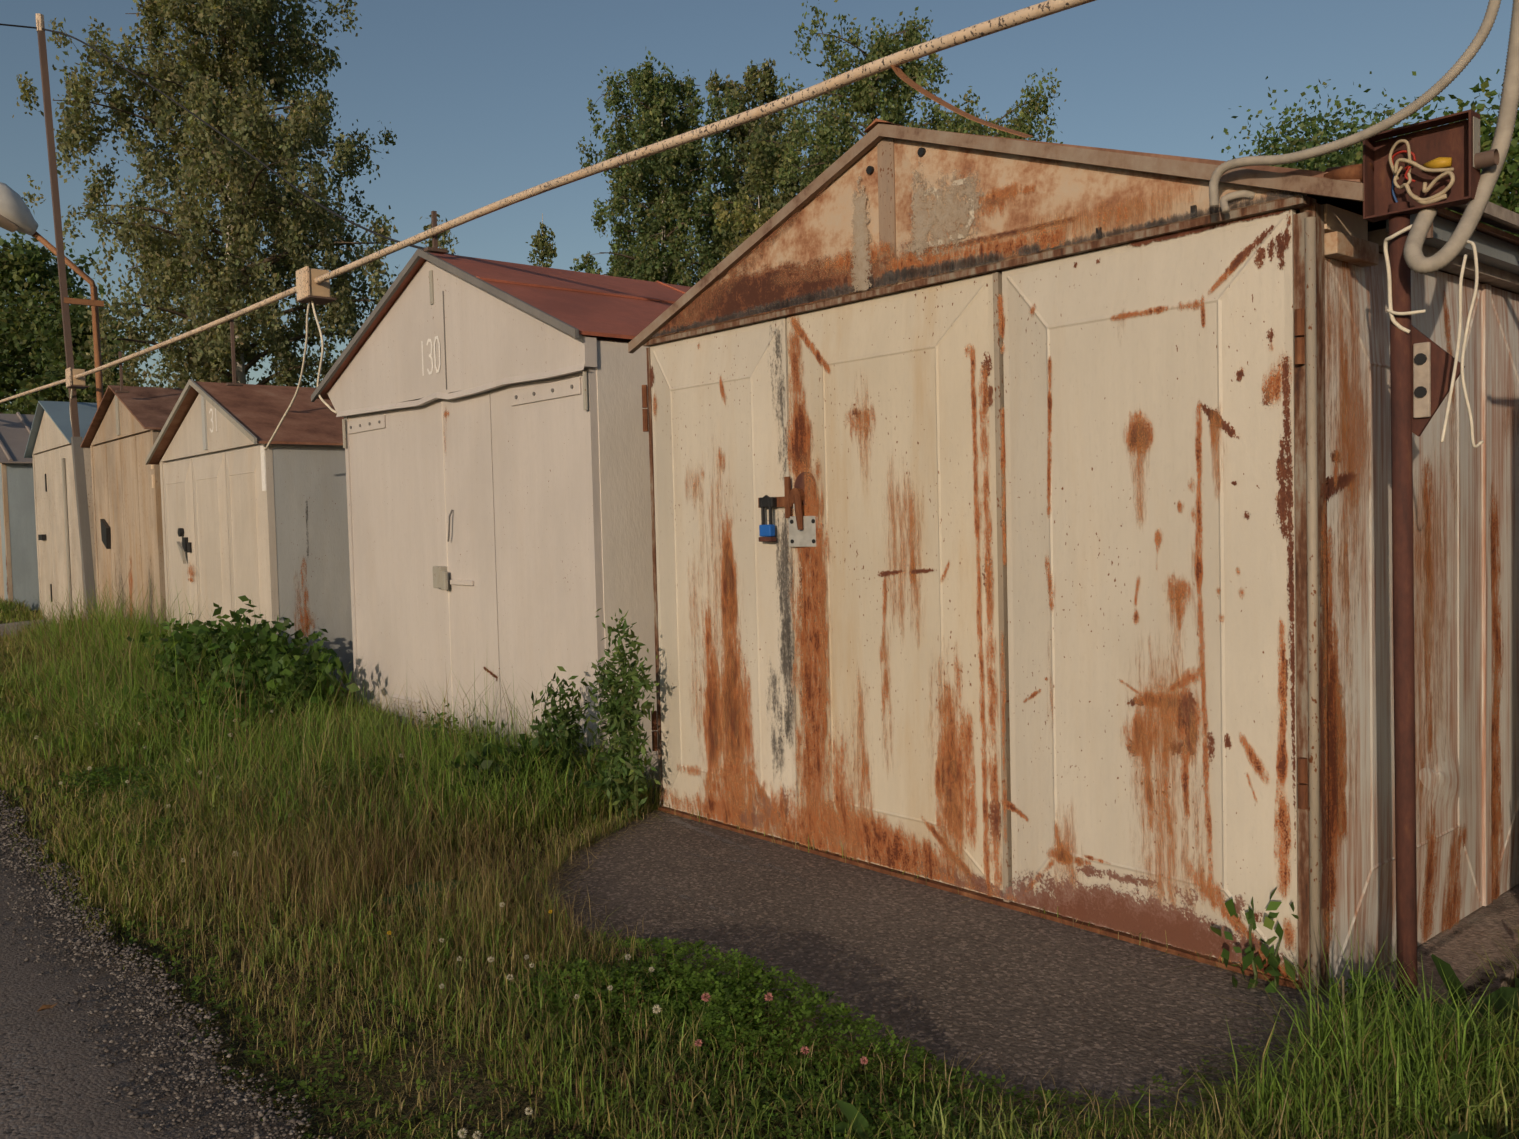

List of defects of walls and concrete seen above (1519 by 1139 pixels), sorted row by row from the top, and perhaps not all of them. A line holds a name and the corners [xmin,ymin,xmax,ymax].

corrosion [655,182,1170,903]
corrosion [1111,298,1206,327]
corrosion [1120,328,1297,982]
corrosion [1320,261,1371,955]
corrosion [1443,290,1453,356]